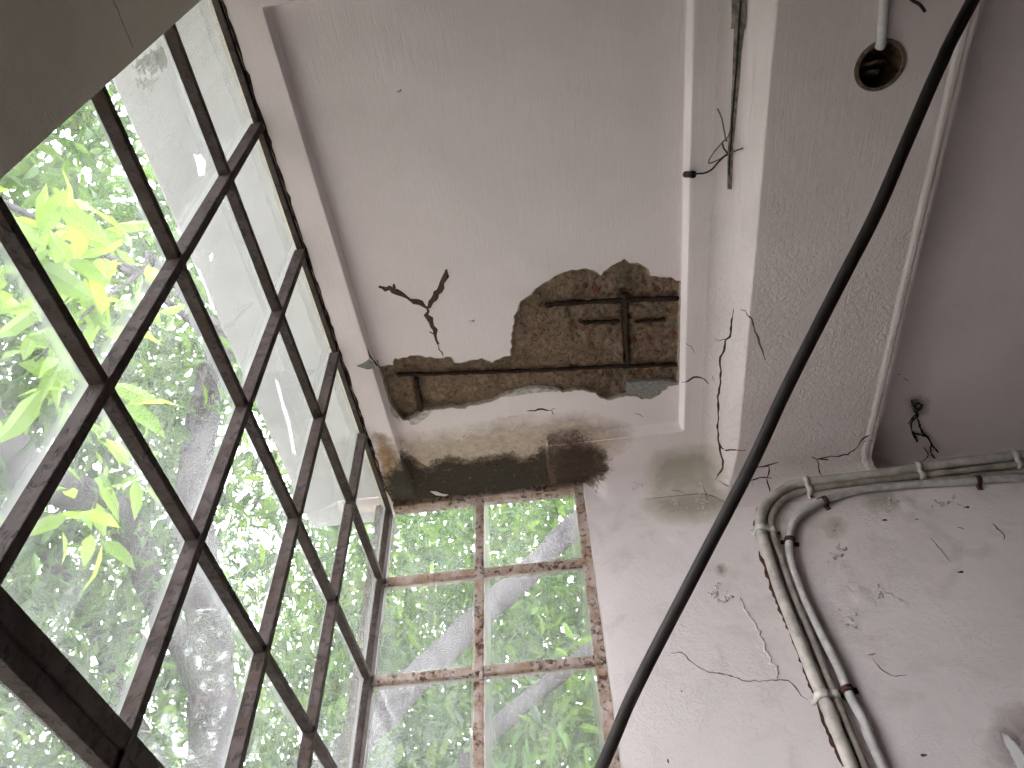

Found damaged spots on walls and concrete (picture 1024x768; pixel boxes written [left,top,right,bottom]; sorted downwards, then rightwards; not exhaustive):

crack [378,270,449,356]
water stain [381,422,613,502]
spalling [357,259,681,425]
crack [673,308,778,526]
crack [812,434,873,475]
crack [673,551,844,767]